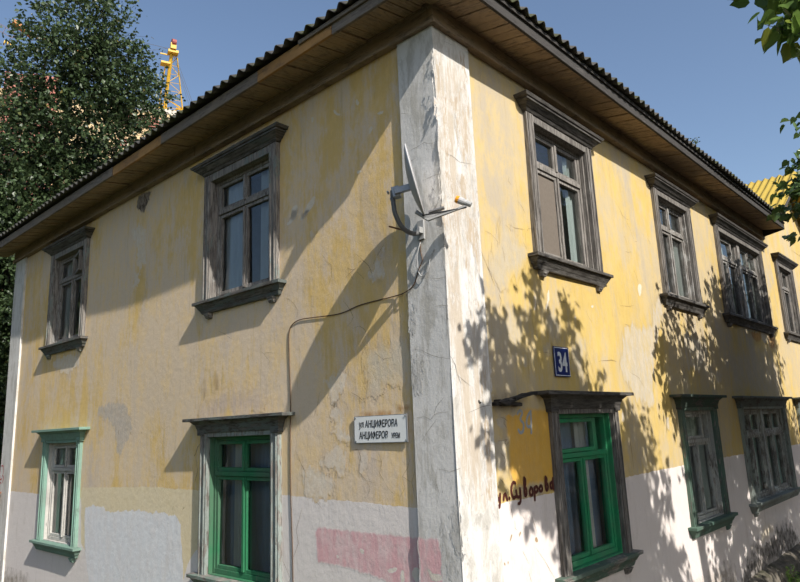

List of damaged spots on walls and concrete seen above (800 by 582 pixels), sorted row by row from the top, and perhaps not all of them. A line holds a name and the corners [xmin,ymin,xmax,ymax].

peeling [619,293,662,410]
peeling [98,401,133,458]
damp [691,518,800,582]